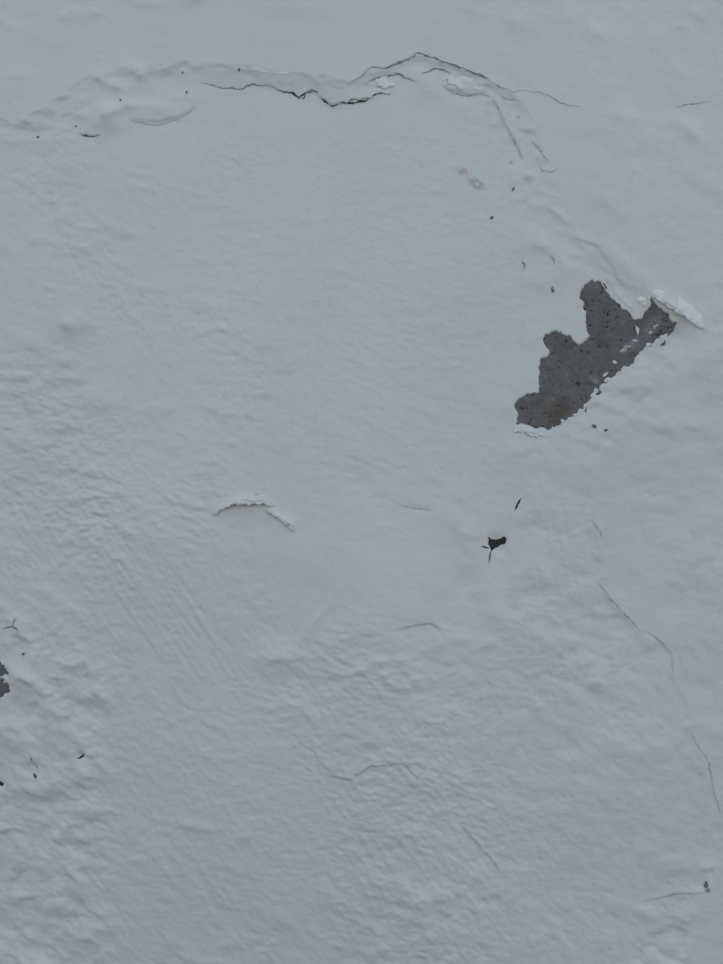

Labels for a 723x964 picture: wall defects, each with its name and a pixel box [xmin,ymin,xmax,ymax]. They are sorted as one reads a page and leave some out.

crack [272,52,579,107]
spalling [513,280,704,438]
peeling [209,491,294,535]
spalling [482,536,507,561]
spalling [0,662,10,698]